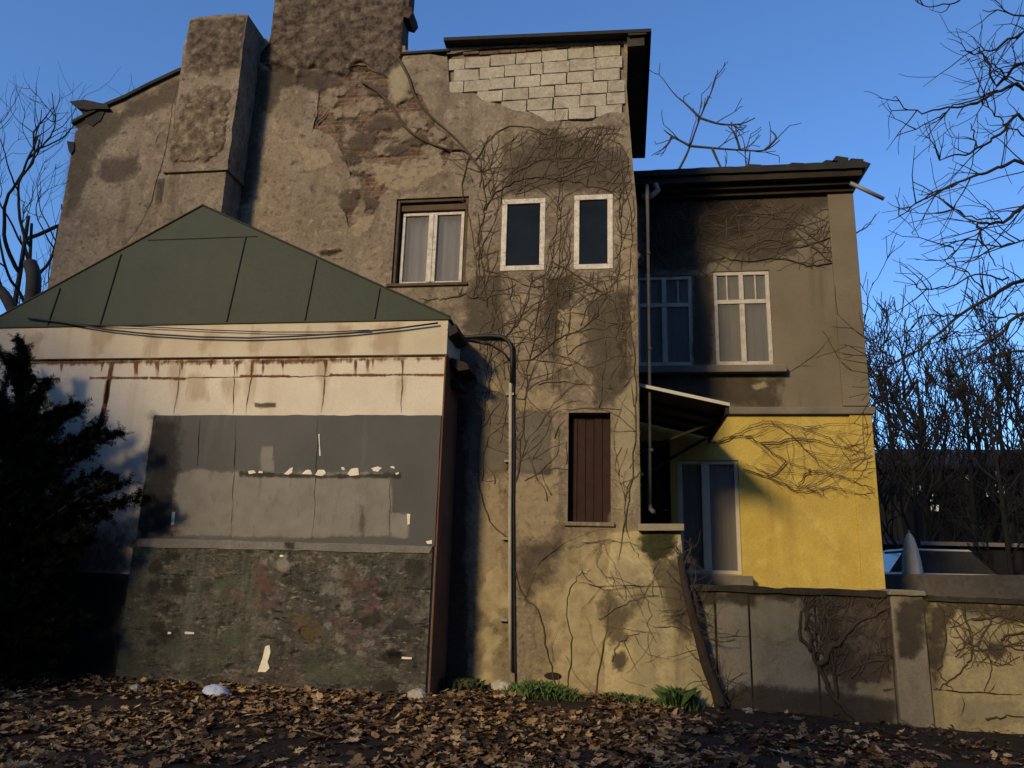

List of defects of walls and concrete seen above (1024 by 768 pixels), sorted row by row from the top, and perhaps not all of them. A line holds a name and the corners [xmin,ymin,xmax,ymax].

leakage [65,80,180,215]
spalling [260,0,455,237]
corrosion [33,358,444,420]
peeling [171,446,410,539]
peeling [258,645,271,672]
leakage [600,591,639,641]
leakage [648,555,1024,724]